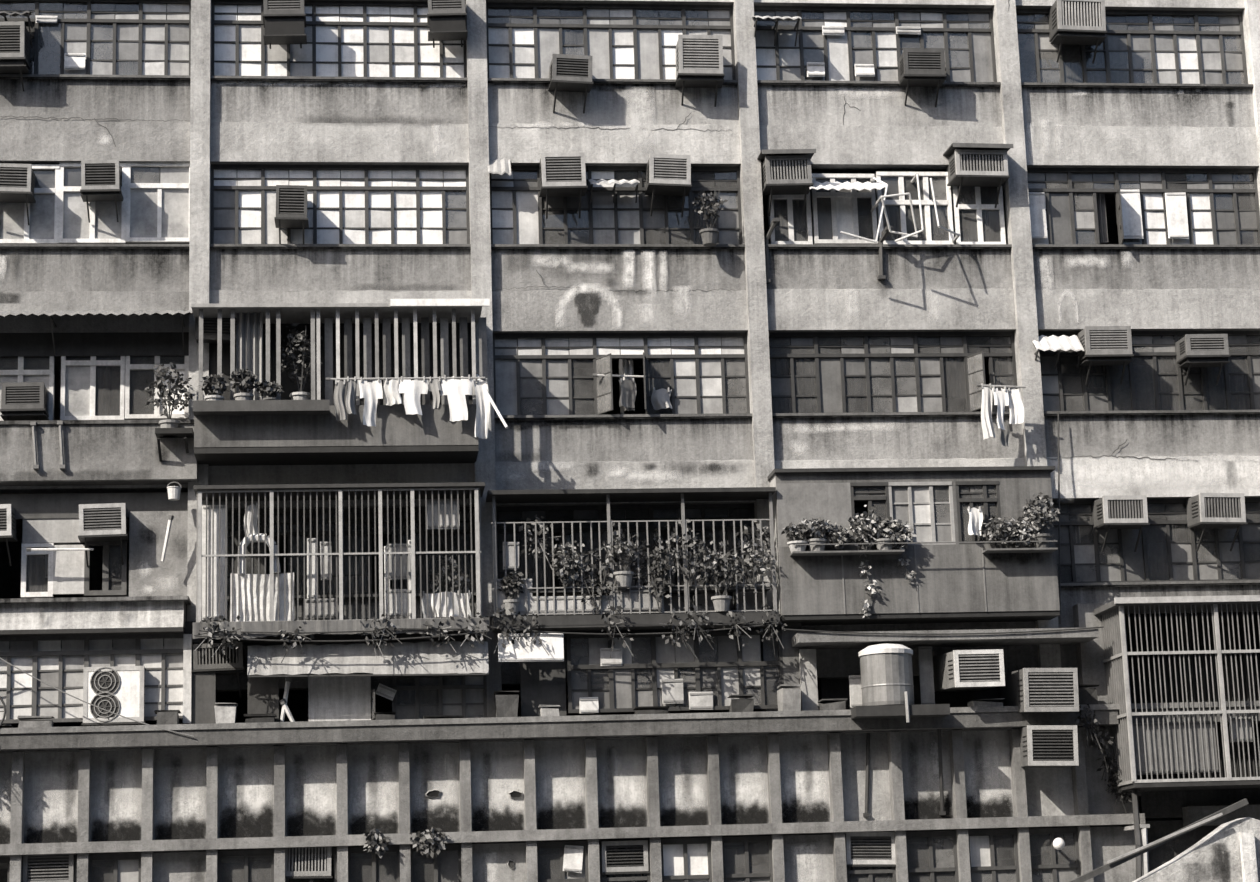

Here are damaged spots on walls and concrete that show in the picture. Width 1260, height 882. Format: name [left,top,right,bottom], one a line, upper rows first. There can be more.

damp [27,802,76,843]
damp [92,803,140,842]
damp [221,776,272,838]
damp [288,780,334,836]
damp [473,779,523,831]
damp [538,777,584,830]
damp [600,773,645,828]
damp [661,783,707,826]
damp [722,776,767,825]
damp [782,769,828,823]
damp [904,795,952,820]
damp [966,771,1011,818]